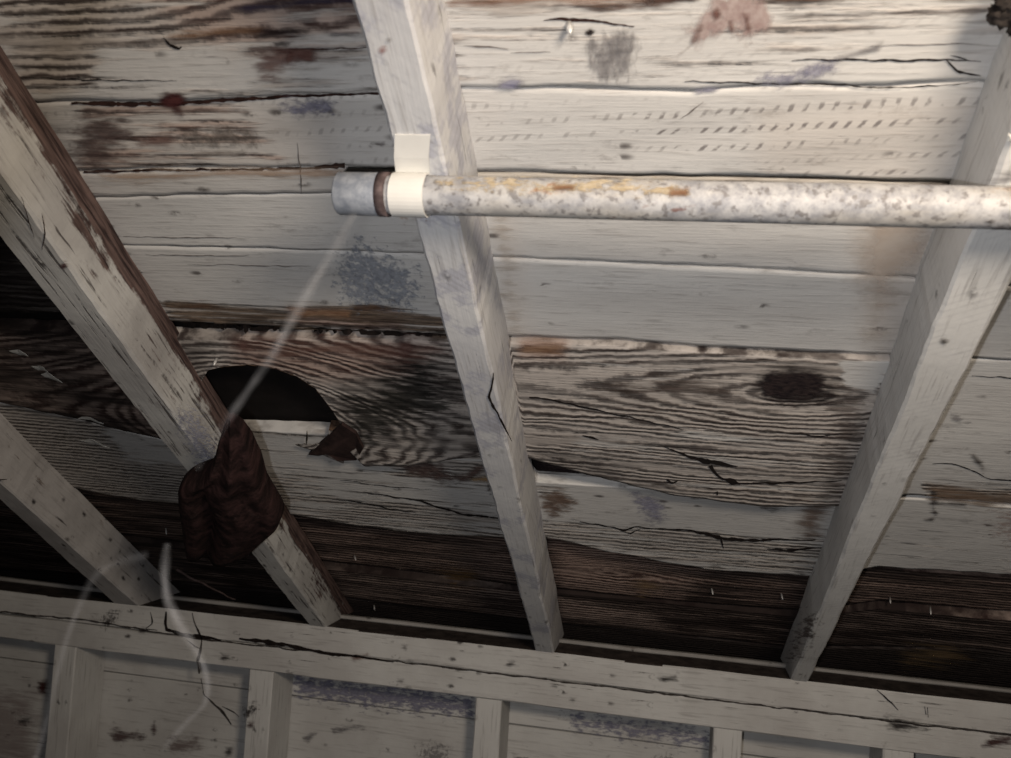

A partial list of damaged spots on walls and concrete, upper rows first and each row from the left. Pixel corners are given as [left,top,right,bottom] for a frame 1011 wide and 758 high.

crack [680,43,989,119]
rust [437,176,688,196]
crack [488,373,512,441]
crack [529,397,842,495]
crack [777,422,865,437]
crack [936,463,1011,481]
crack [580,521,822,552]
crack [0,611,1011,736]